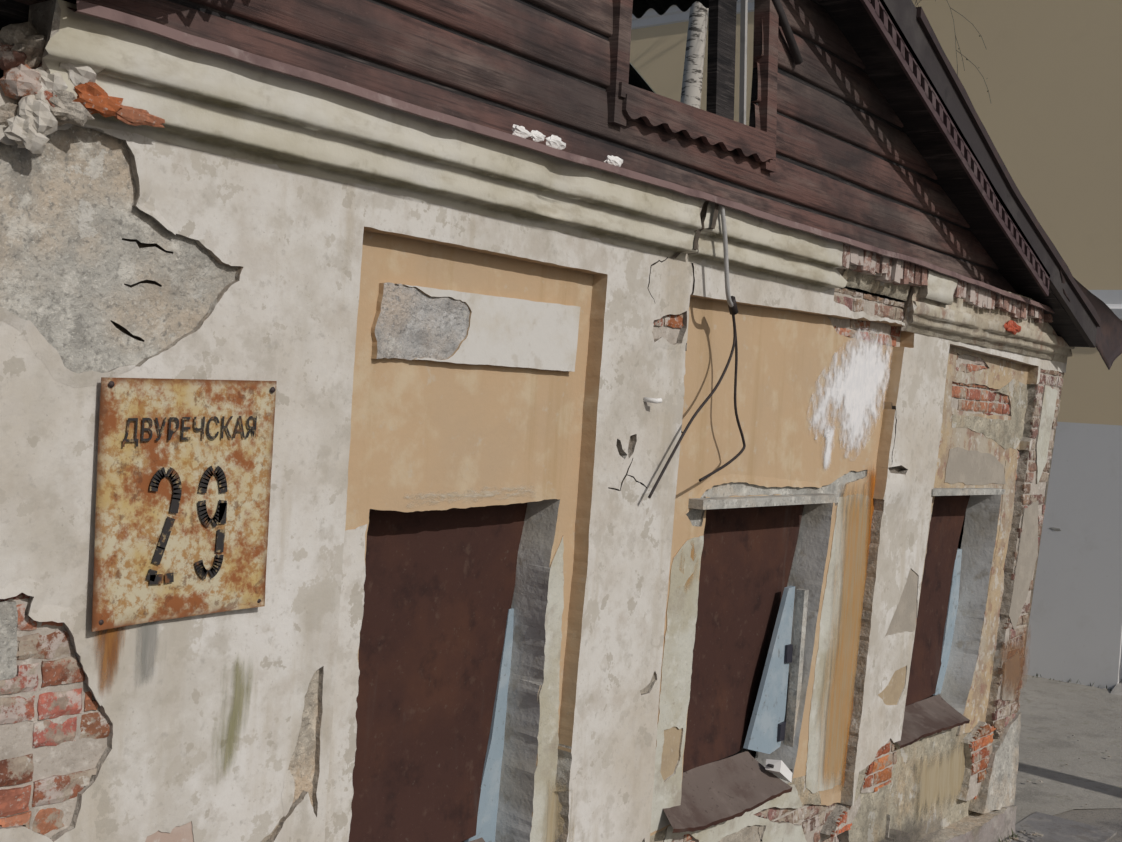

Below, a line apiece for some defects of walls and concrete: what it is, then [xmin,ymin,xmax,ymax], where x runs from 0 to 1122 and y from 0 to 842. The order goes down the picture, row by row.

flaking render [0,21,243,388]
flaking render [375,282,472,360]
flaking render [646,311,687,352]
flaking render [828,288,914,348]
flaking render [951,353,1011,416]
flaking render [616,434,637,459]
flaking render [686,469,868,527]
flaking render [718,369,1063,842]
flaking render [0,577,113,842]
rust [98,627,123,688]
flaking render [640,672,657,695]
flaking render [261,666,324,842]